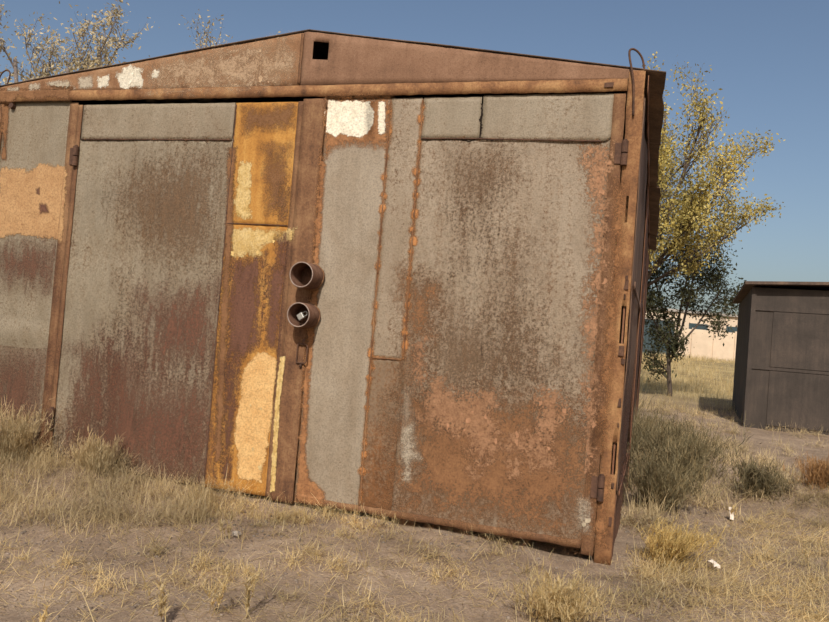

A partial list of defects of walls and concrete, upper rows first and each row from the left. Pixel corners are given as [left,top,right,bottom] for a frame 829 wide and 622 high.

corrosion [243,103,294,134]
peeling [326,99,386,138]
corrosion [418,136,542,270]
corrosion [379,168,647,546]